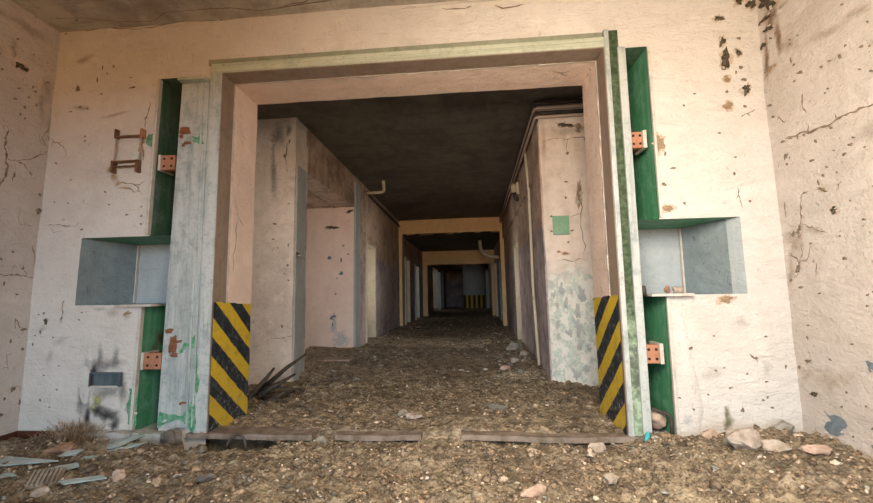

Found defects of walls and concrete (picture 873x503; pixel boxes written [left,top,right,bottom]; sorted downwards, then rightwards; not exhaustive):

crack [55,0,330,31]
spalling [733,0,780,50]
spalling [718,35,752,112]
crack [777,93,873,139]
crack [0,126,67,185]
rust [153,328,182,357]
damp [79,398,118,429]
peeling [823,406,854,438]